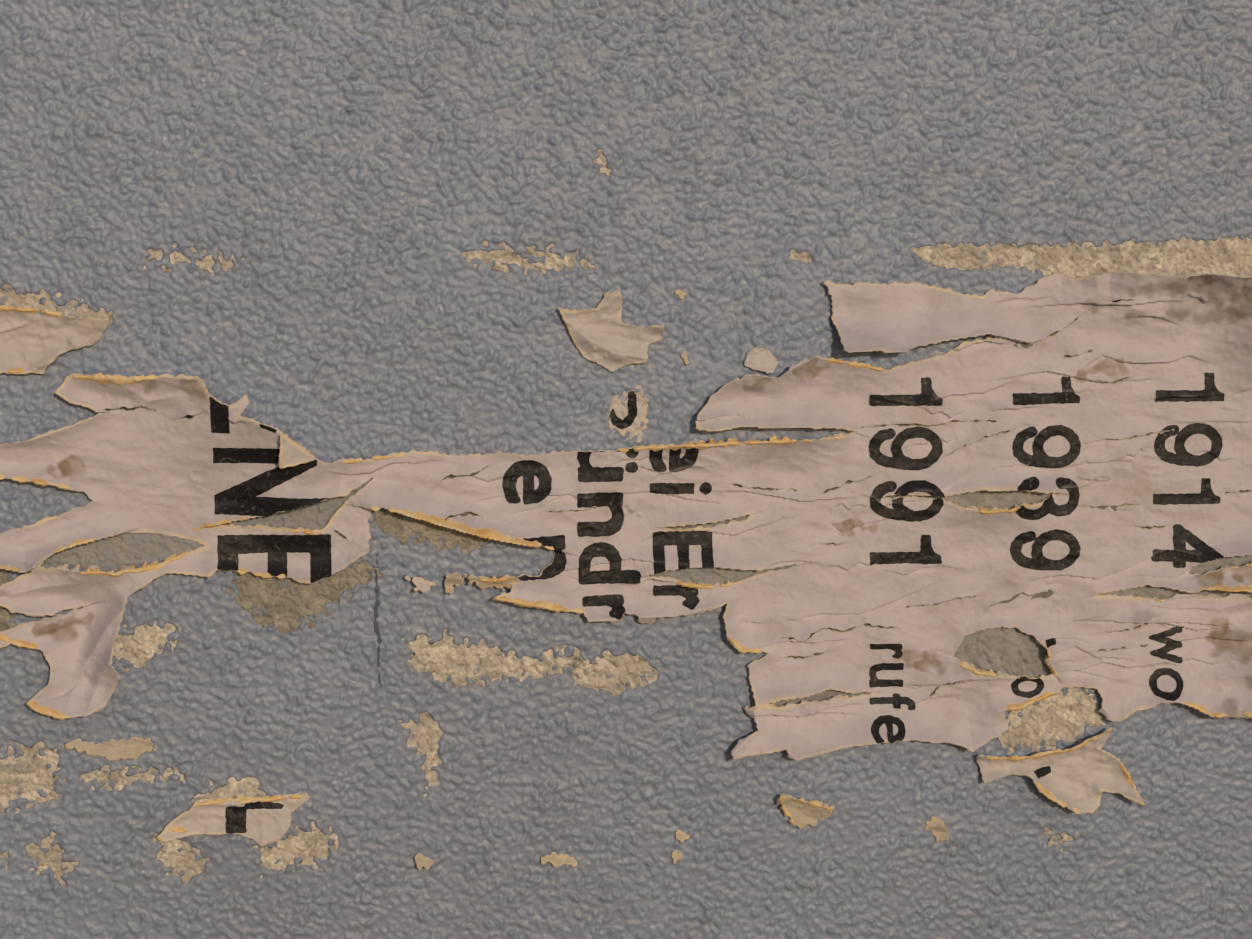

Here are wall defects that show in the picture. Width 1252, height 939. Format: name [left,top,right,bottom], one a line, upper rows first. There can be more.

flaking render [144,243,245,276]
flaking render [462,241,595,276]
flaking render [911,236,1252,278]
flaking render [0,569,12,586]
flaking render [0,606,18,632]
flaking render [402,629,660,695]
flaking render [0,737,185,816]
flaking render [191,777,266,803]
flaking render [398,712,443,797]
flaking render [25,831,79,887]
flaking render [153,832,210,885]
flaking render [253,818,339,878]